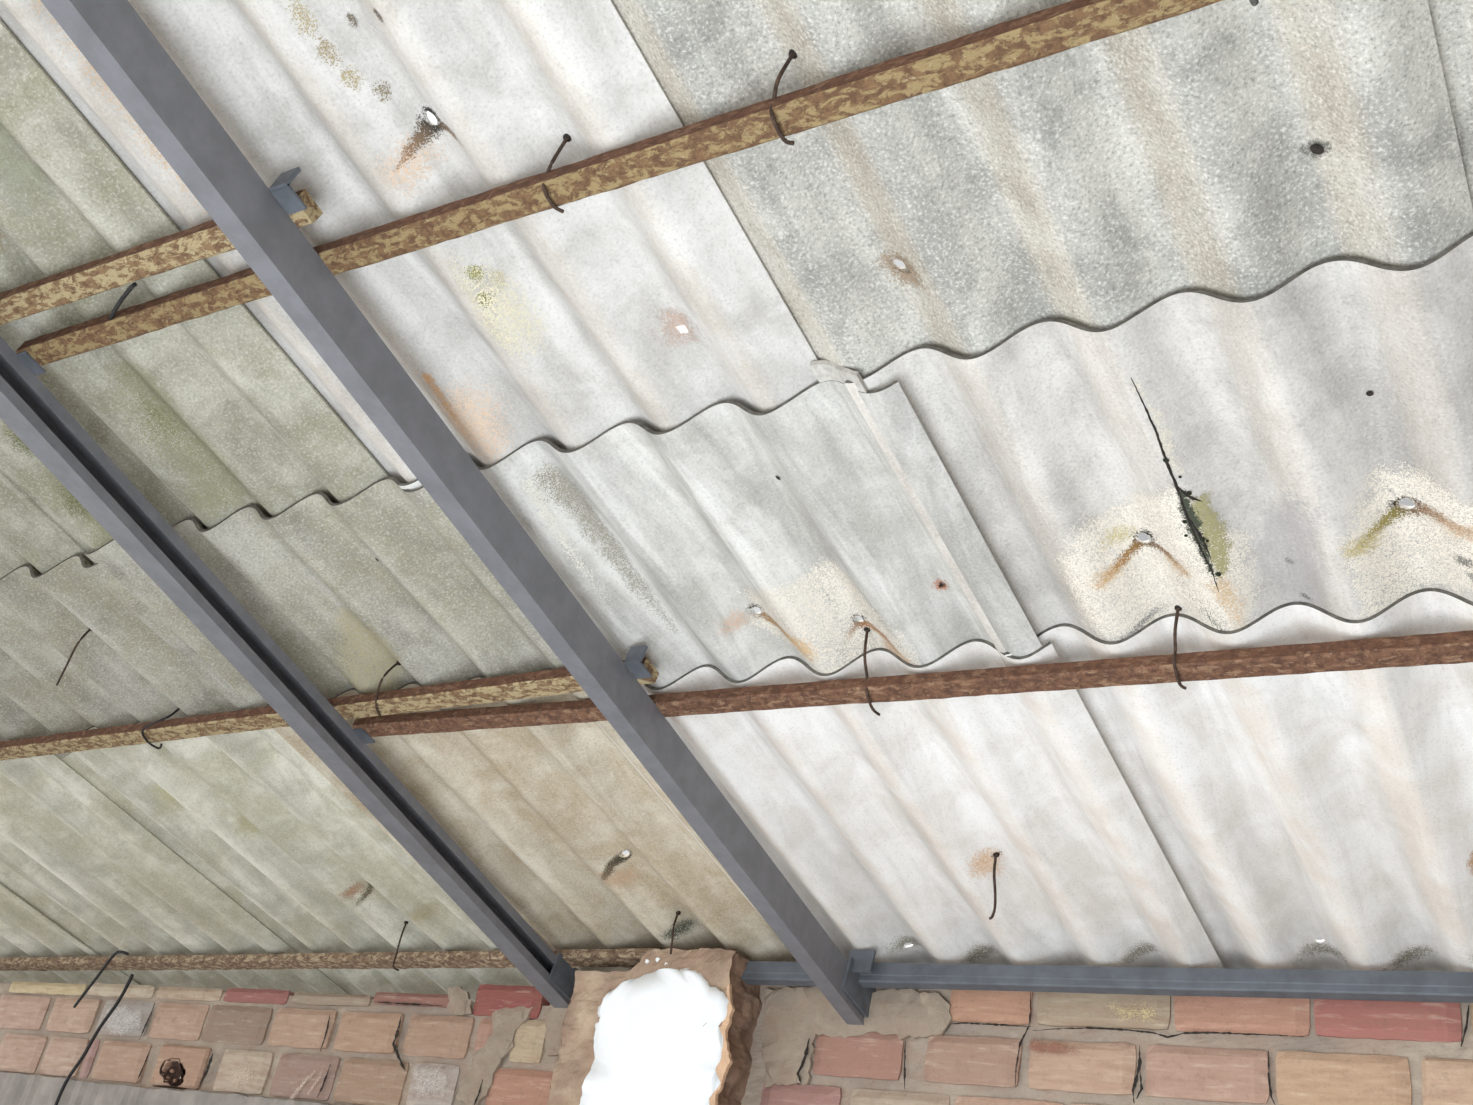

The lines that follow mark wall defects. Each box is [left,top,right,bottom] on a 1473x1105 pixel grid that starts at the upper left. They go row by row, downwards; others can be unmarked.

corrosion [372,105,460,202]
corrosion [716,557,921,674]
corrosion [1052,484,1263,641]
crack [1129,363,1249,630]
corrosion [1335,460,1473,620]
peeling [579,958,735,1105]